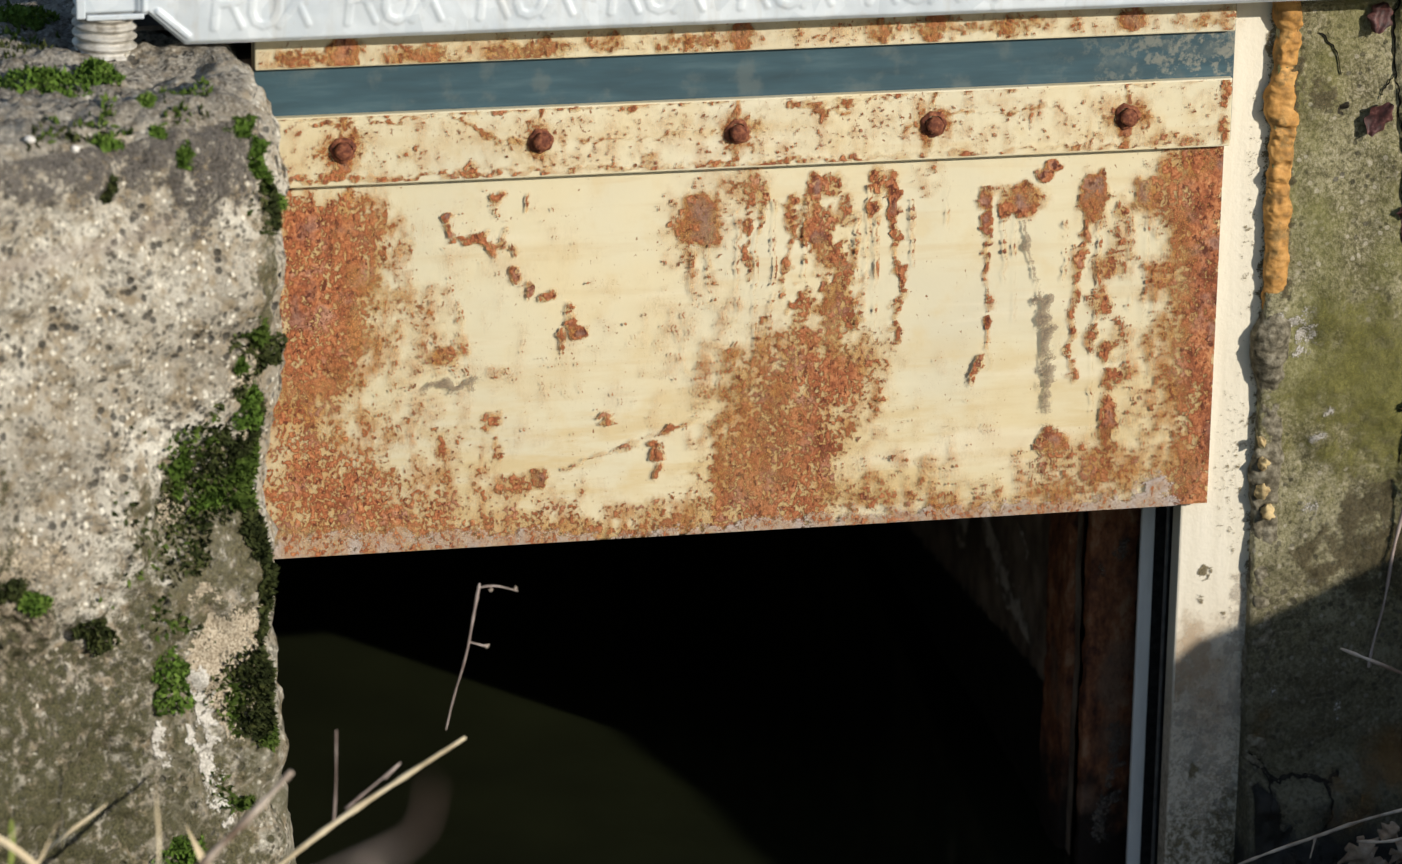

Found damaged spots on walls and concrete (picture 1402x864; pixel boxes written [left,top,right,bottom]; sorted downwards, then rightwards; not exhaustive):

rust [259,6,1239,69]
crack [1380,0,1402,143]
rust [263,80,1233,558]
damp [1022,220,1058,424]